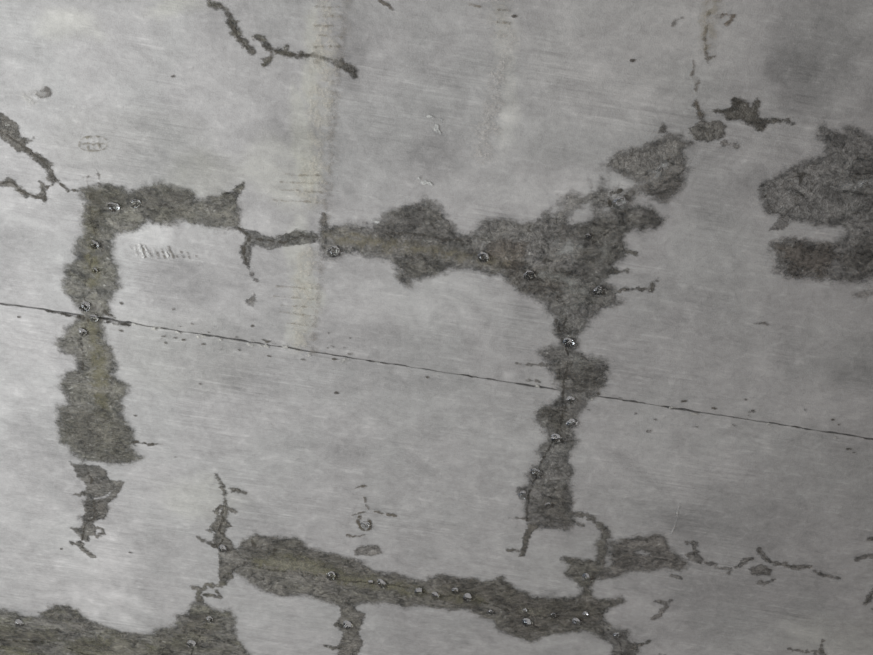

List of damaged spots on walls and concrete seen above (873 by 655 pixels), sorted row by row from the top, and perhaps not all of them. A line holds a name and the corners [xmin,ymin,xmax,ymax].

crack [207,0,357,79]
crack [0,113,78,202]
damp [759,126,873,297]
damp [0,97,794,655]
crack [685,541,841,585]
crack [854,537,873,562]
crack [863,588,873,610]